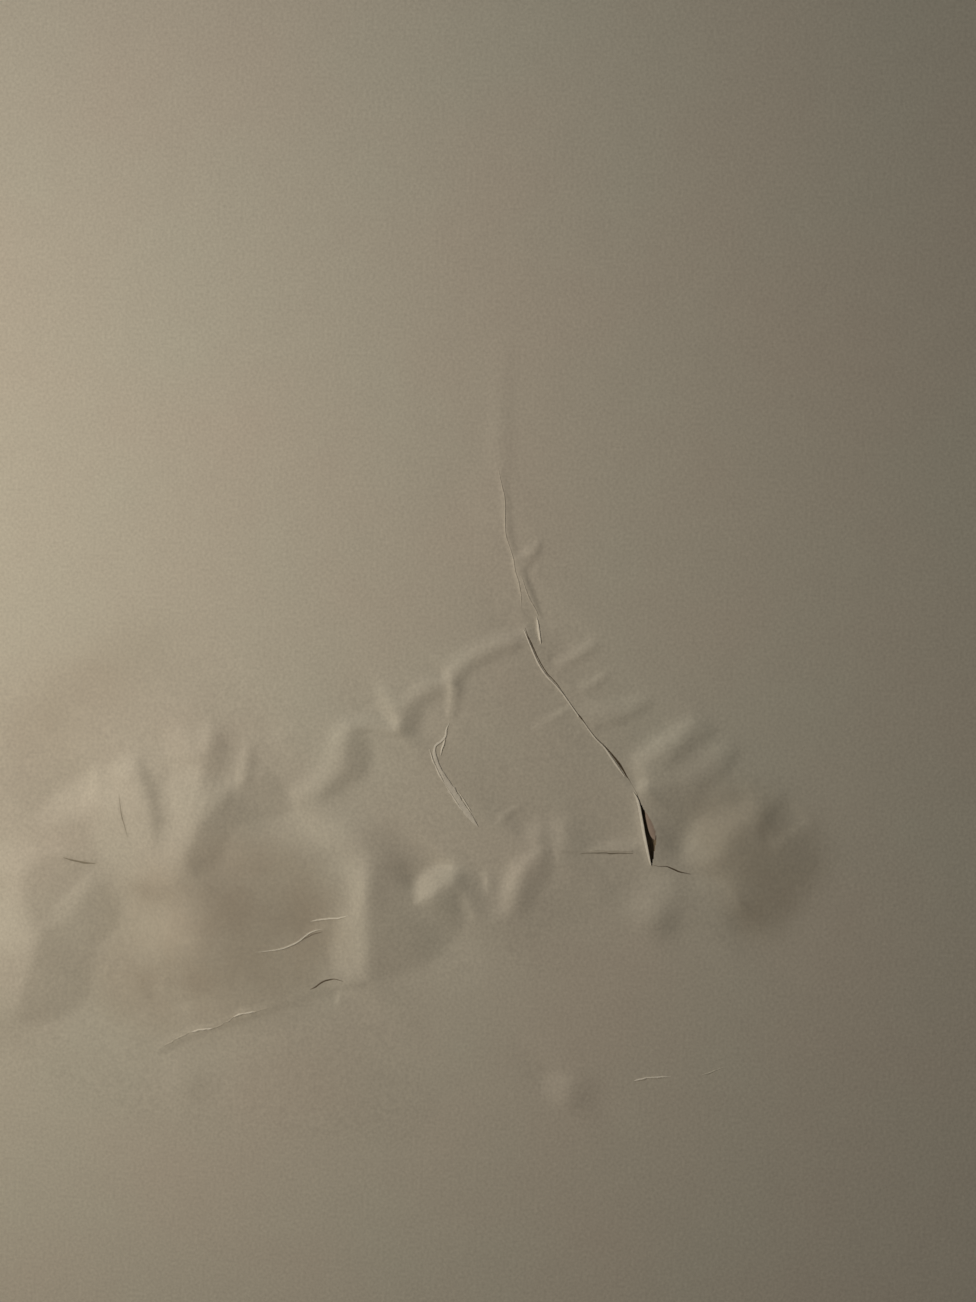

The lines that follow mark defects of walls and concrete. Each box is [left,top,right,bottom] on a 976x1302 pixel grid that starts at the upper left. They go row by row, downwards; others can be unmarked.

crack [255,916,347,953]